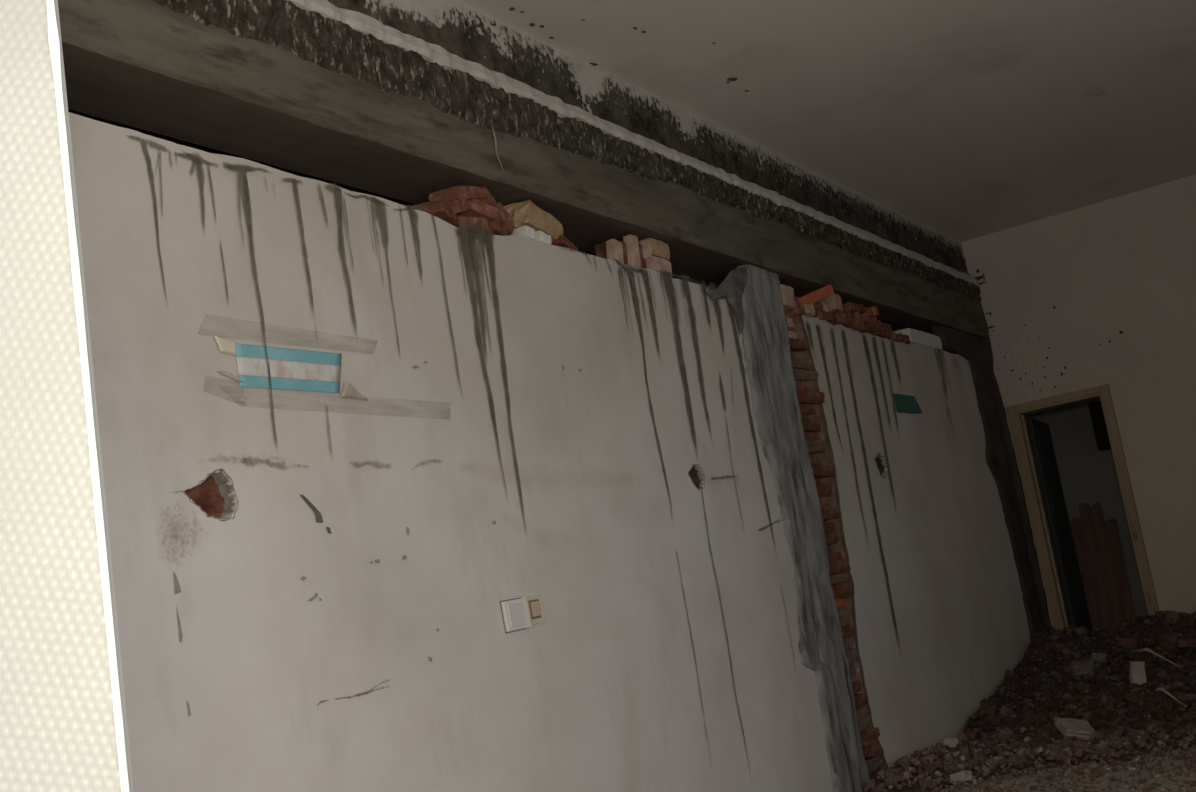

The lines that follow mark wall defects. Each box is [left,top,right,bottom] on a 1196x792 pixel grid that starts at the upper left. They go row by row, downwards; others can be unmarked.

leakage [130,136,268,337]
spalling [182,468,238,521]
leakage [266,352,277,443]
leakage [284,178,314,308]
leakage [319,185,460,381]
leakage [456,220,525,523]
leakage [327,0,969,274]
leakage [608,260,775,545]
spalling [688,464,705,491]
leakage [702,492,746,744]
flaking render [785,301,910,781]
leakage [806,322,902,641]